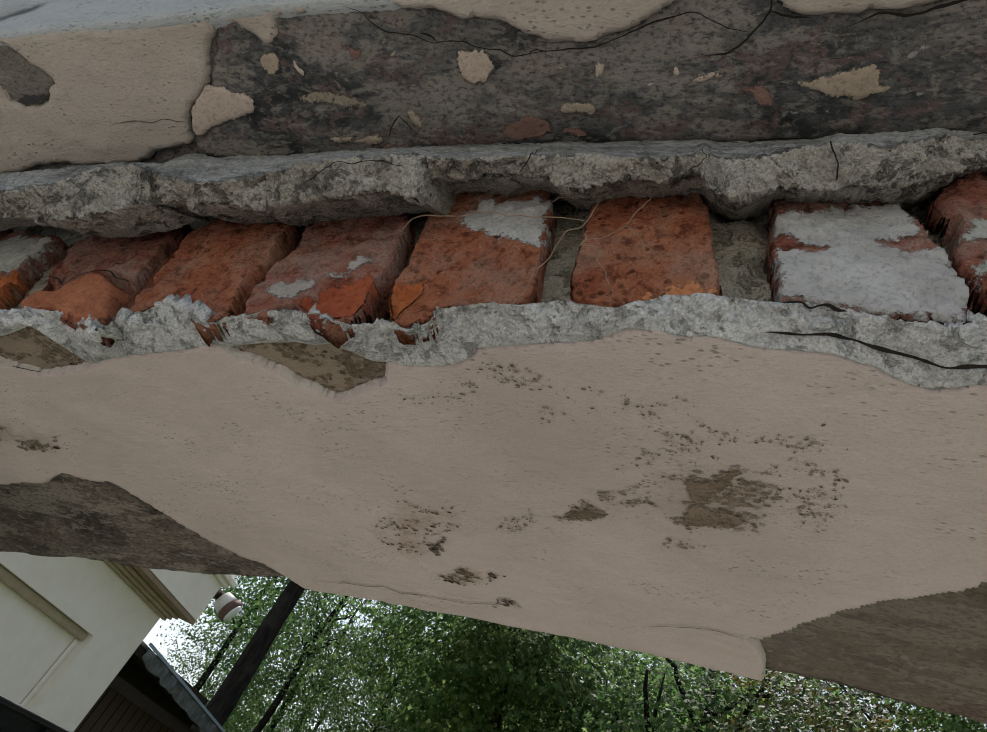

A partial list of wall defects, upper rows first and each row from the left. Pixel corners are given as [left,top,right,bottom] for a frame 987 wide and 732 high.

crack [344,0,811,57]
crack [847,0,968,27]
peeling [0,0,987,238]
flaking render [0,268,987,393]
crack [767,301,987,369]
peeling [0,473,285,577]
water stain [539,395,849,549]
peeling [760,582,987,724]